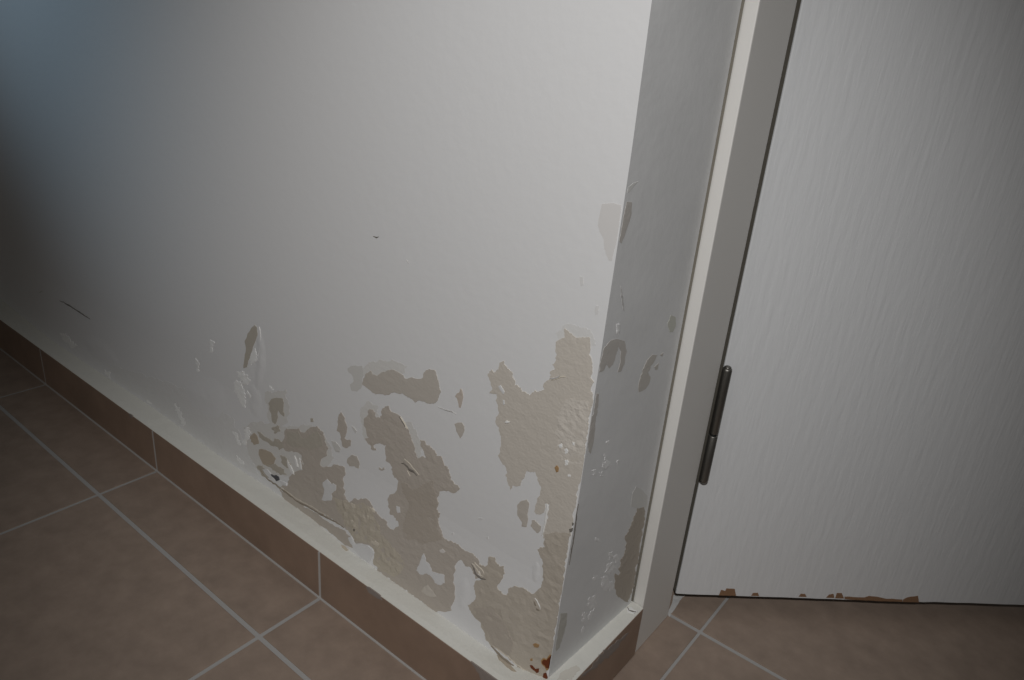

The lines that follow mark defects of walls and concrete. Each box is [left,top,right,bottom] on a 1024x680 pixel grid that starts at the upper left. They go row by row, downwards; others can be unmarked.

peeling [619,202,632,243]
crack [260,470,344,528]
peeling [243,325,627,677]
spalling [614,507,645,602]